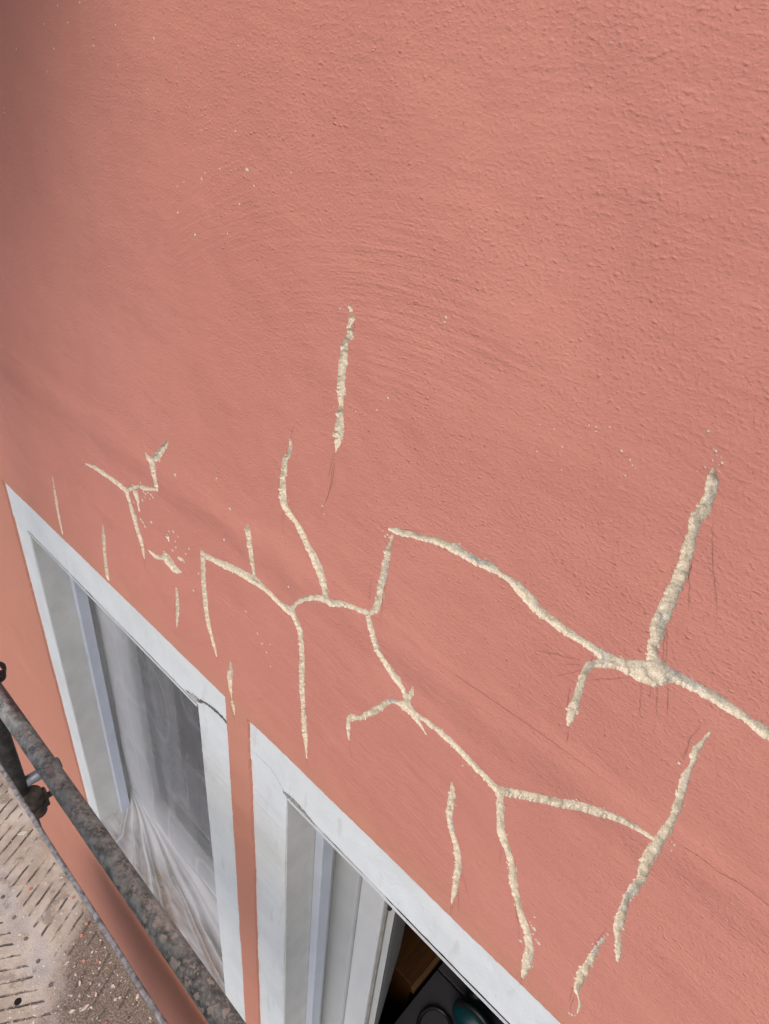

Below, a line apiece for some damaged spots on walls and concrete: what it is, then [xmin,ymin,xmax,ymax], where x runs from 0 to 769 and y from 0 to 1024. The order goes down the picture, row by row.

crack [82,305,769,1016]